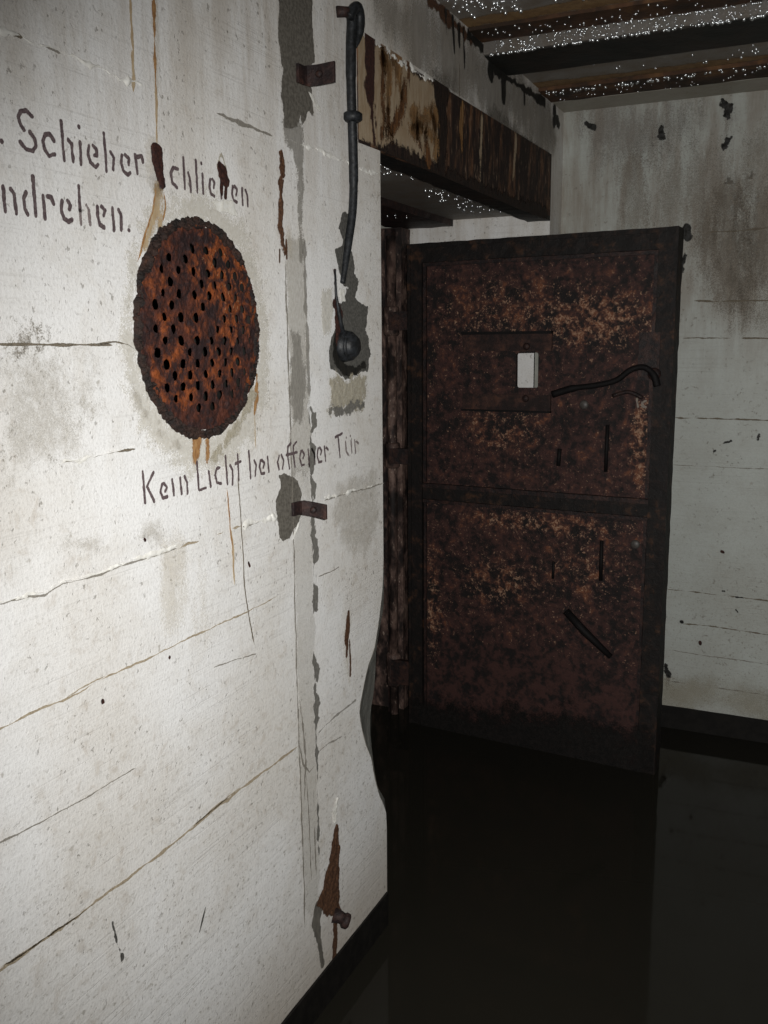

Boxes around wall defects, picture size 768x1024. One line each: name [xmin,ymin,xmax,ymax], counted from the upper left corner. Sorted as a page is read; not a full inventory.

rust [137,0,166,262]
rust [277,150,288,263]
water stain [374,0,556,182]
rust [192,437,210,464]
crack [0,267,383,972]
rust [312,797,342,968]